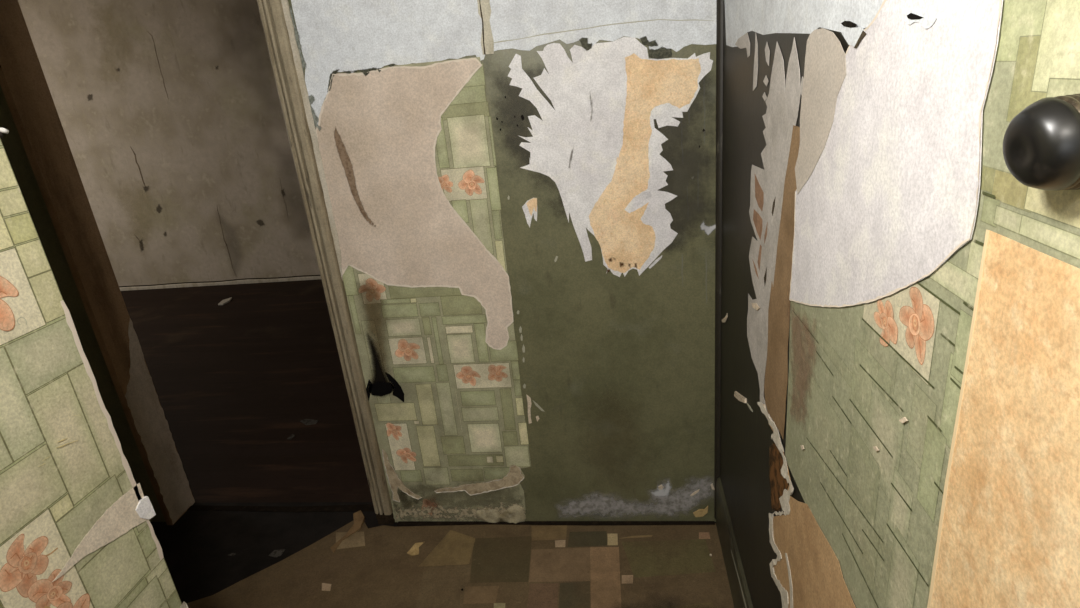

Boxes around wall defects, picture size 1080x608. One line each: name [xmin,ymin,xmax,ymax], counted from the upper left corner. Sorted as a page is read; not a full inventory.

peeling [640,36,672,59]
peeling [789,0,1003,307]
peeling [308,58,525,362]
peeling [522,198,537,227]
peeling [734,391,766,412]
peeling [52,319,195,582]
water stain [560,479,715,516]
peeling [769,443,789,511]